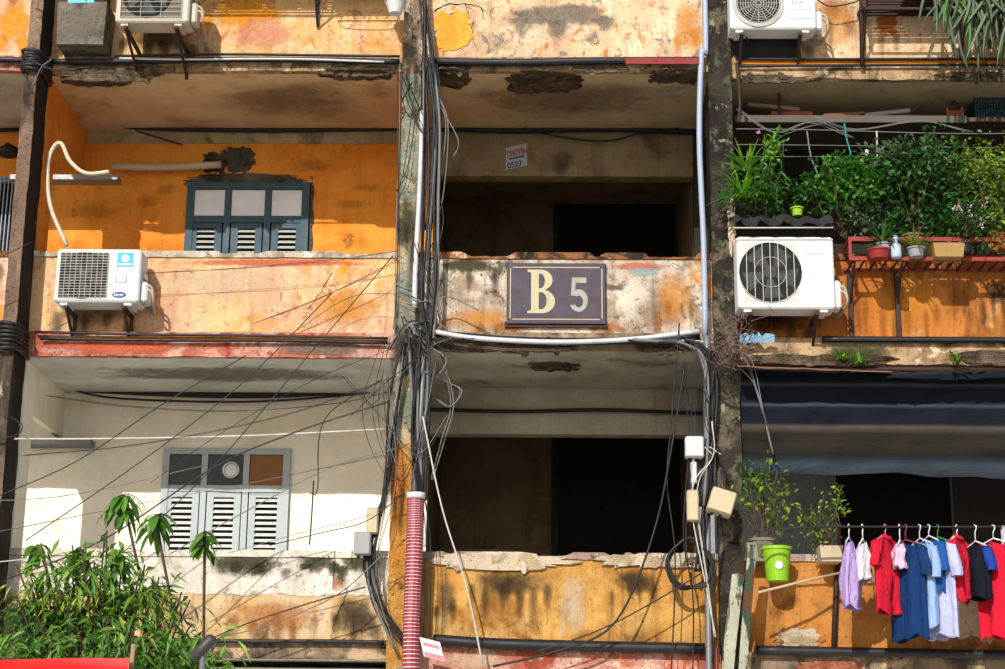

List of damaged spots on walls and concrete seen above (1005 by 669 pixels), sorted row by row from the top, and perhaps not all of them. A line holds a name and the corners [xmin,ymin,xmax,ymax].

peeling [433,9,474,52]
damp [549,21,565,37]
spalling [52,64,176,84]
spalling [314,64,397,81]
damp [982,283,1005,314]
spalling [430,340,577,366]
damp [329,562,348,581]
spalling [427,551,581,574]
spalling [593,552,698,569]
damp [484,574,530,608]
damp [622,573,654,593]